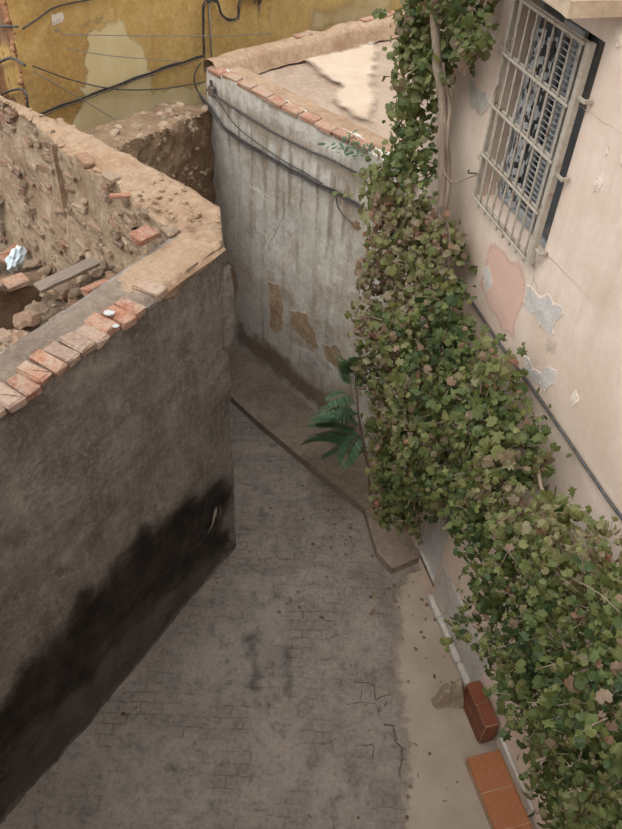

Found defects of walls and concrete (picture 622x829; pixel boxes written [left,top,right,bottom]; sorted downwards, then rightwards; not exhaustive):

peeling [268,281,348,370]
peeling [524,285,564,338]
peeling [523,356,557,392]